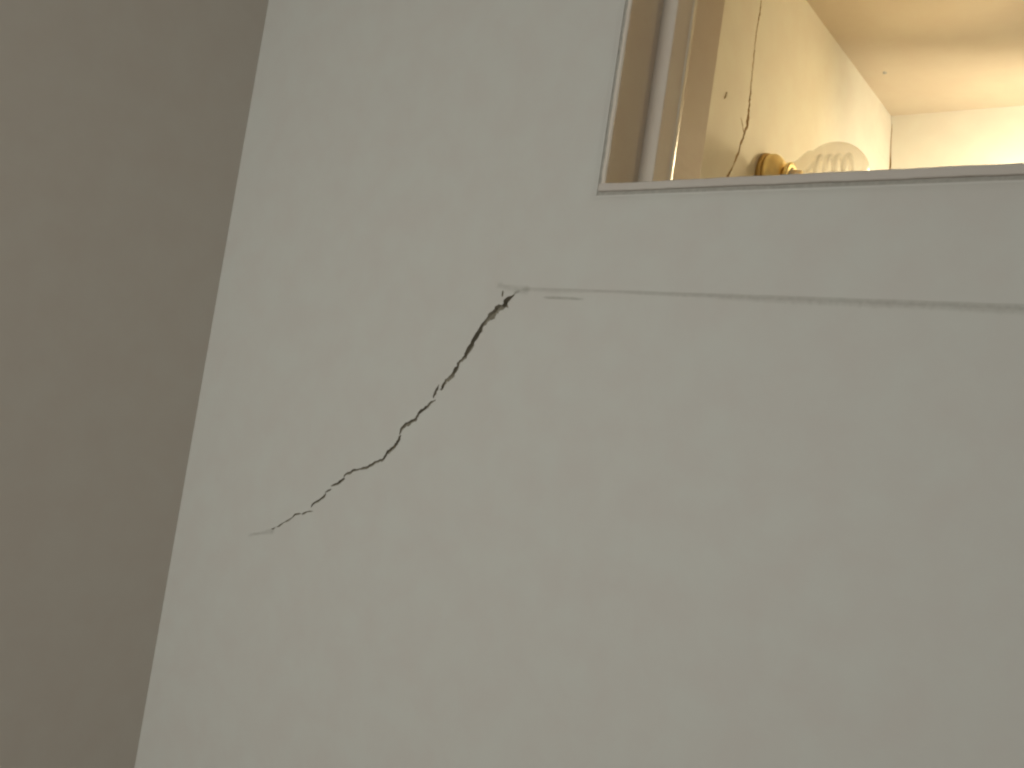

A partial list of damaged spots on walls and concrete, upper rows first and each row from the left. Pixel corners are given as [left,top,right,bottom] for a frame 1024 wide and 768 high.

crack [597,0,1024,196]
crack [272,291,514,530]